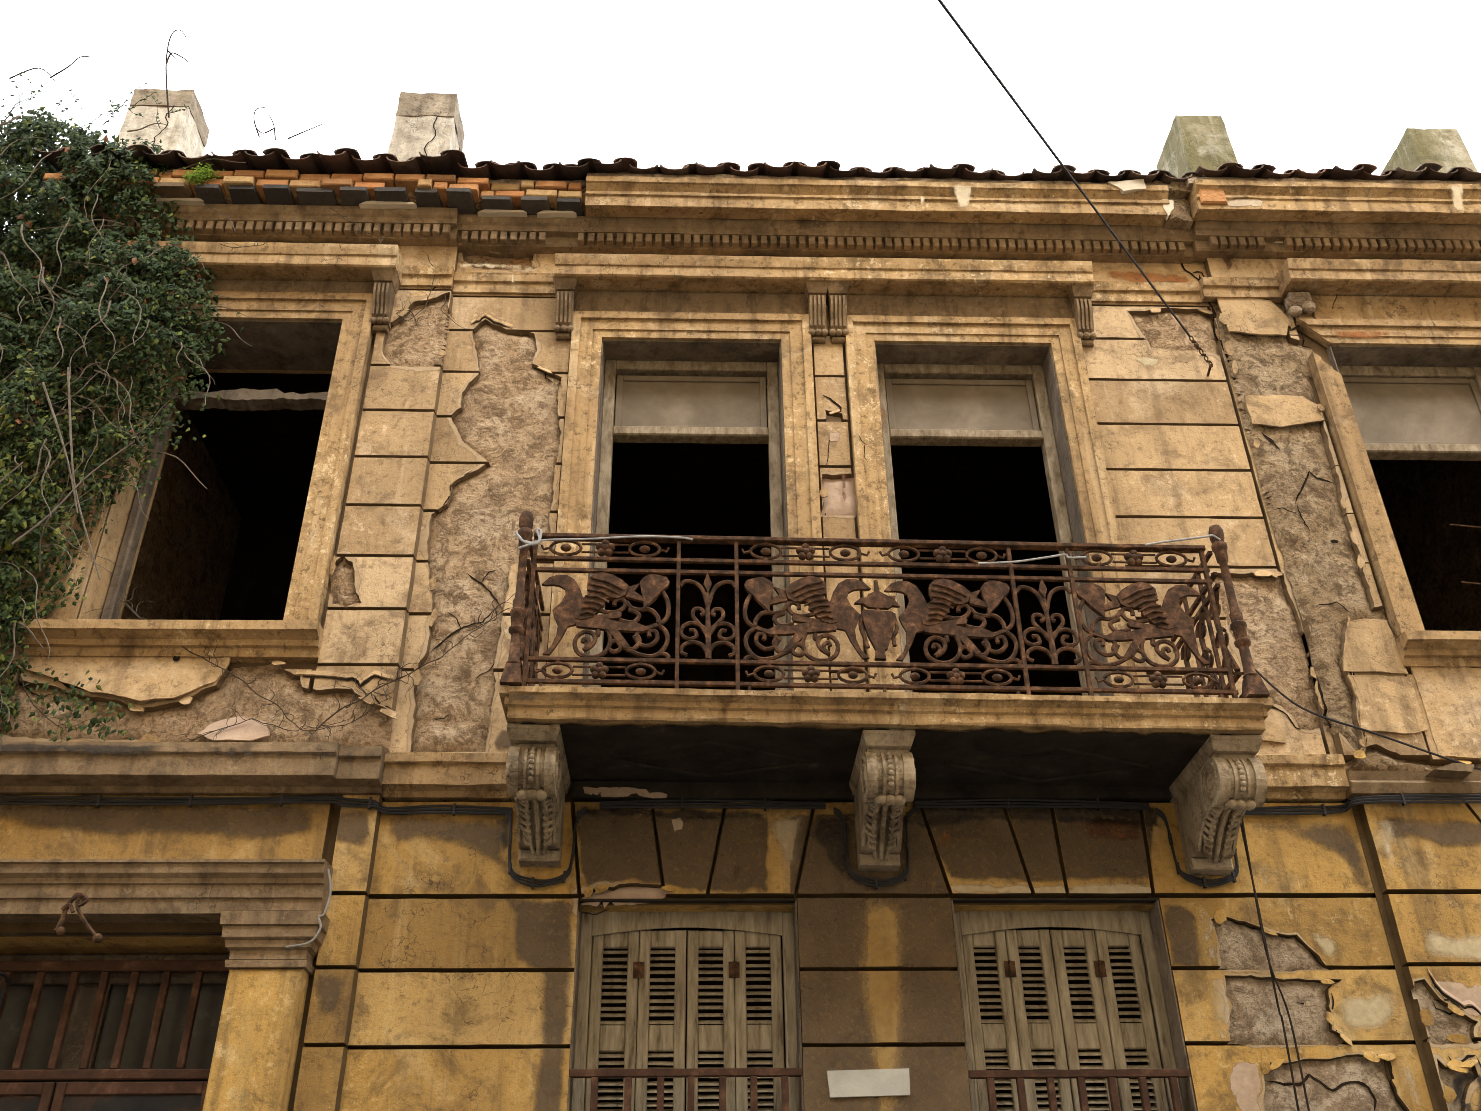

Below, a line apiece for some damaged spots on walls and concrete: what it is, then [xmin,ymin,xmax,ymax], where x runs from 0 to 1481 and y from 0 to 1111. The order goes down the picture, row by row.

flaking render [381,291,451,372]
flaking render [0,318,564,752]
flaking render [1127,298,1481,772]
crack [1272,601,1367,746]
water stain [508,899,571,1111]
water stain [578,802,1159,1111]
water stain [1165,906,1198,966]
flaking render [1202,909,1418,1111]
flaking render [1411,977,1481,1111]
peeling [1429,934,1481,958]